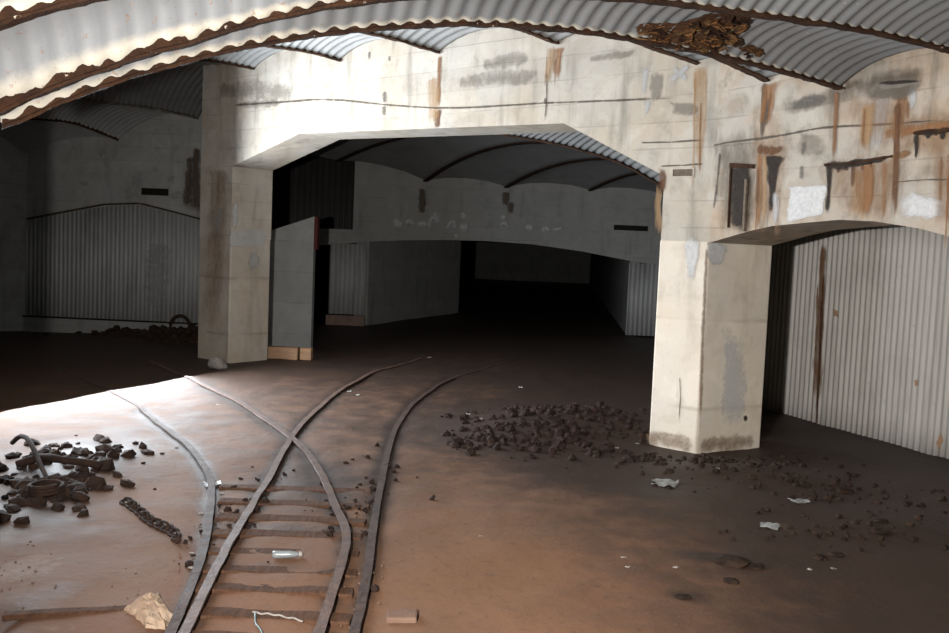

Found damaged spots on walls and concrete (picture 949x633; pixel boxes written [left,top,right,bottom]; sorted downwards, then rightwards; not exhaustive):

corrosion [432,57,442,127]
corrosion [545,48,564,82]
corrosion [635,14,765,59]
corrosion [183,149,200,209]
corrosion [693,103,706,170]
corrosion [755,84,783,230]
corrosion [856,97,949,213]
corrosion [811,246,838,424]